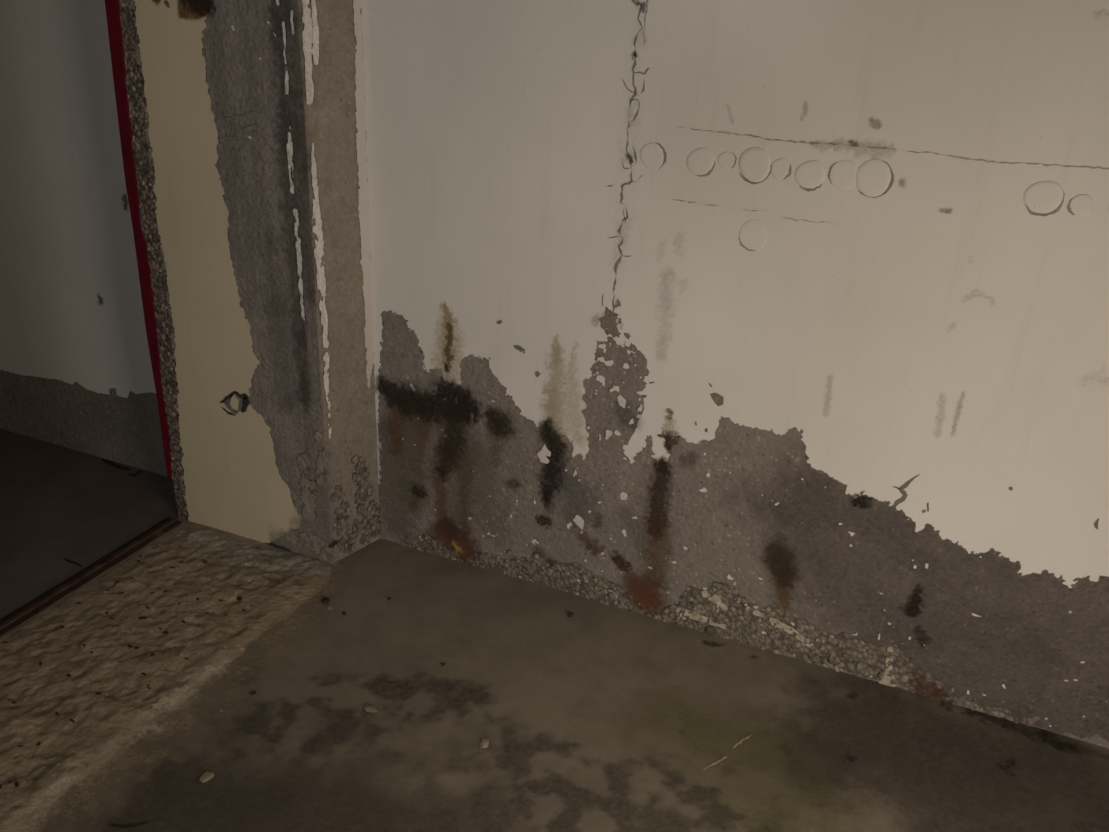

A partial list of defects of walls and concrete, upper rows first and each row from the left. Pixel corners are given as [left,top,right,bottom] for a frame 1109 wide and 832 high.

corrosion [153,0,216,19]
crack [602,0,649,346]
corrosion [376,305,513,562]
peeling [202,0,1109,749]
corrosion [644,409,679,563]
corrosion [581,535,661,610]
corrosion [763,541,799,607]
damp [75,749,510,832]